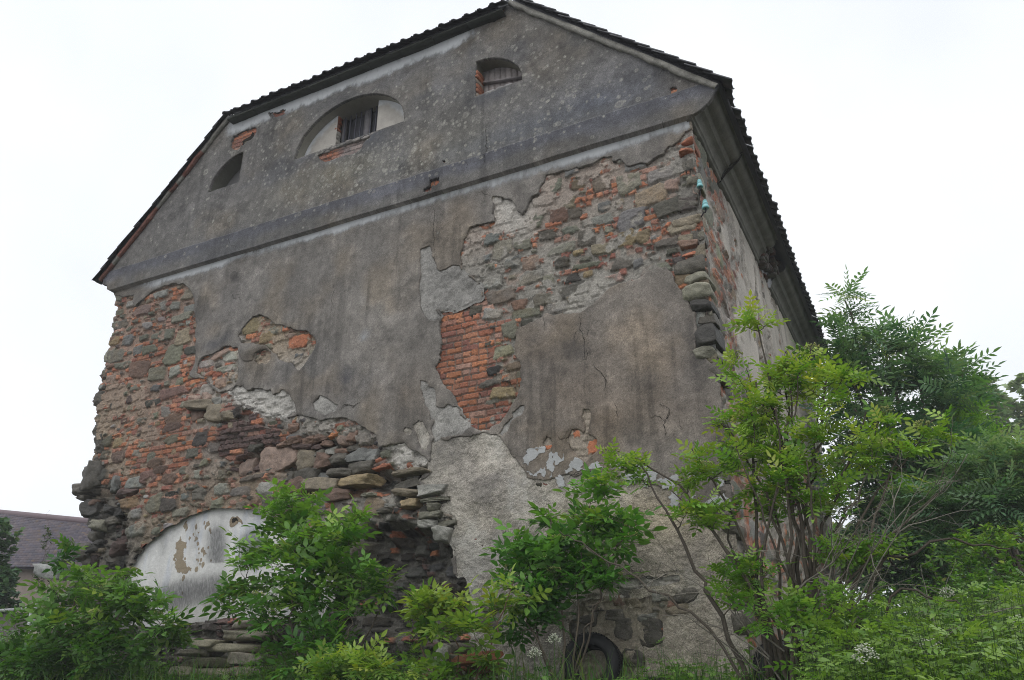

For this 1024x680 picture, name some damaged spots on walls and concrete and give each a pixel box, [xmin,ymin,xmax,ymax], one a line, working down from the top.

spalling [68,128,752,680]
crack [574,317,618,416]